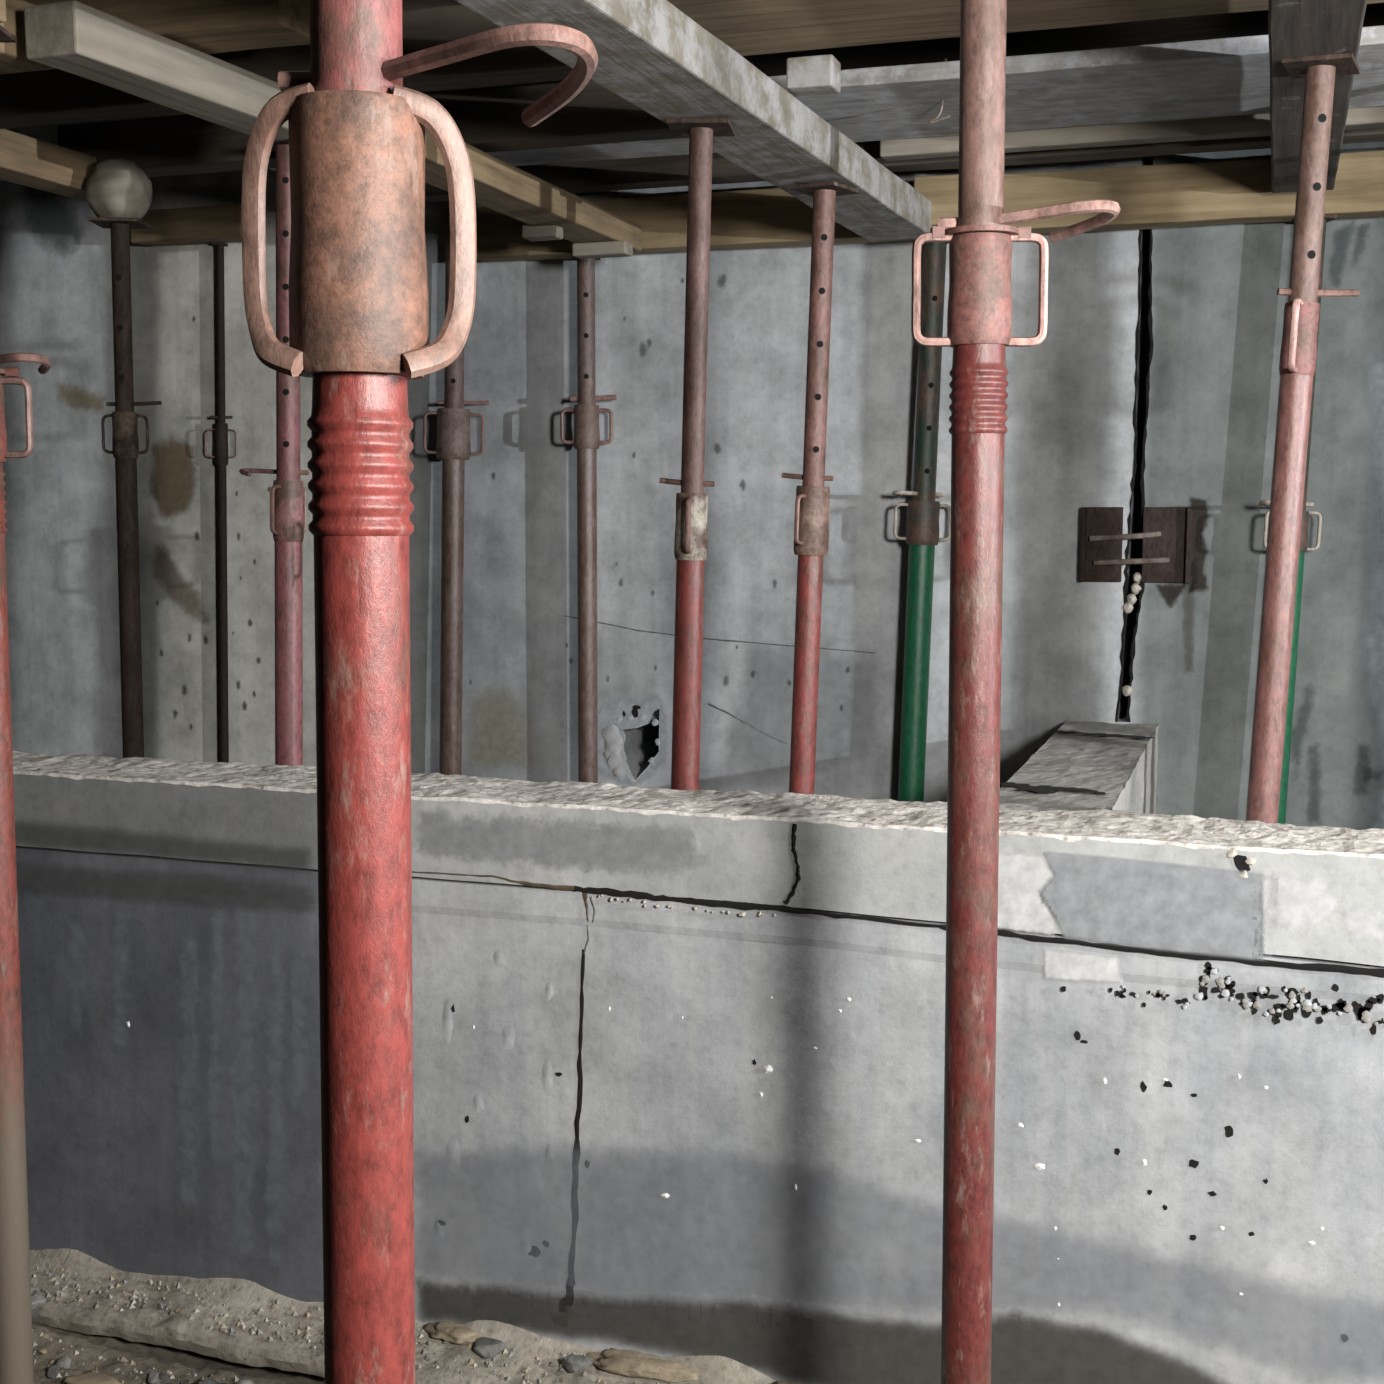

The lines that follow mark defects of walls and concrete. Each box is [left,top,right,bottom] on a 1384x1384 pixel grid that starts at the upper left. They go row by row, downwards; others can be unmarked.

spalling [601,705,660,778]
crack [997,929,1384,977]
crack [412,823,946,1312]